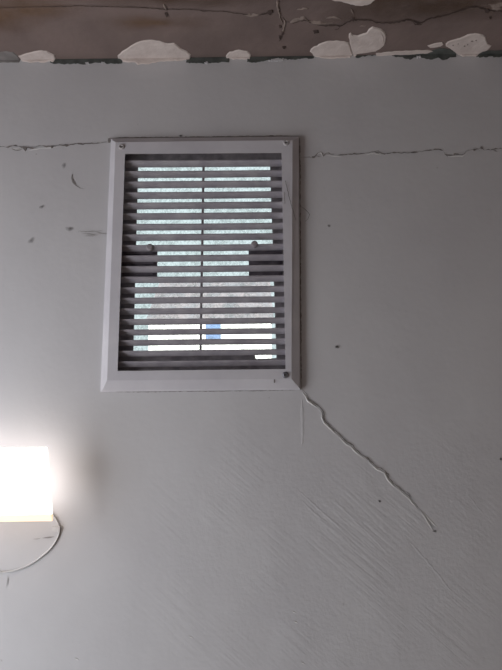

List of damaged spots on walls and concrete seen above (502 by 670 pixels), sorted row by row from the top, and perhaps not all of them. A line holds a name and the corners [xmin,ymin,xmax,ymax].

crack [4,5,275,17]
crack [290,6,502,30]
peeling [247,0,314,63]
peeling [392,45,456,60]
peeling [476,50,502,58]
crack [0,138,111,151]
crack [311,147,502,158]
crack [303,391,438,529]